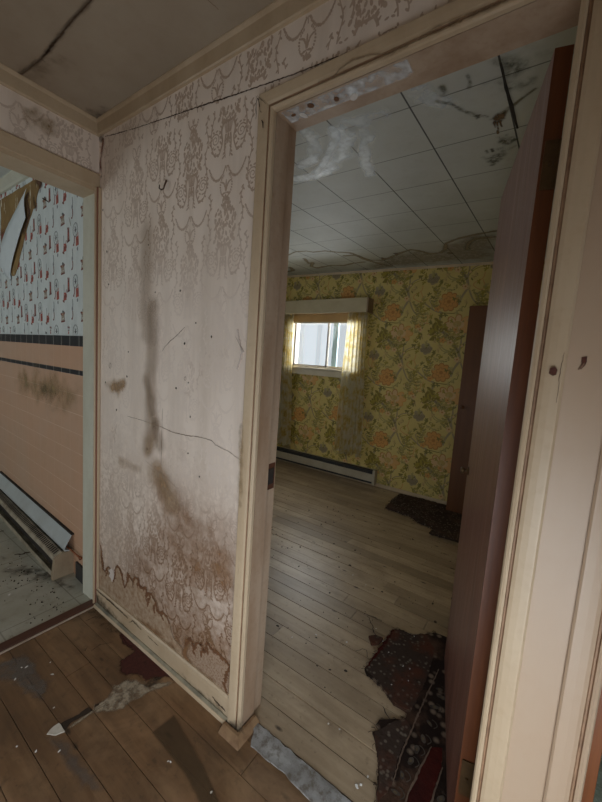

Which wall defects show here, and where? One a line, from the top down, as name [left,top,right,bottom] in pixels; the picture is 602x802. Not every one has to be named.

crack [19,0,92,75]
water stain [334,0,506,76]
crack [105,52,346,137]
water stain [293,127,373,182]
water stain [486,88,536,165]
water stain [120,625,170,687]